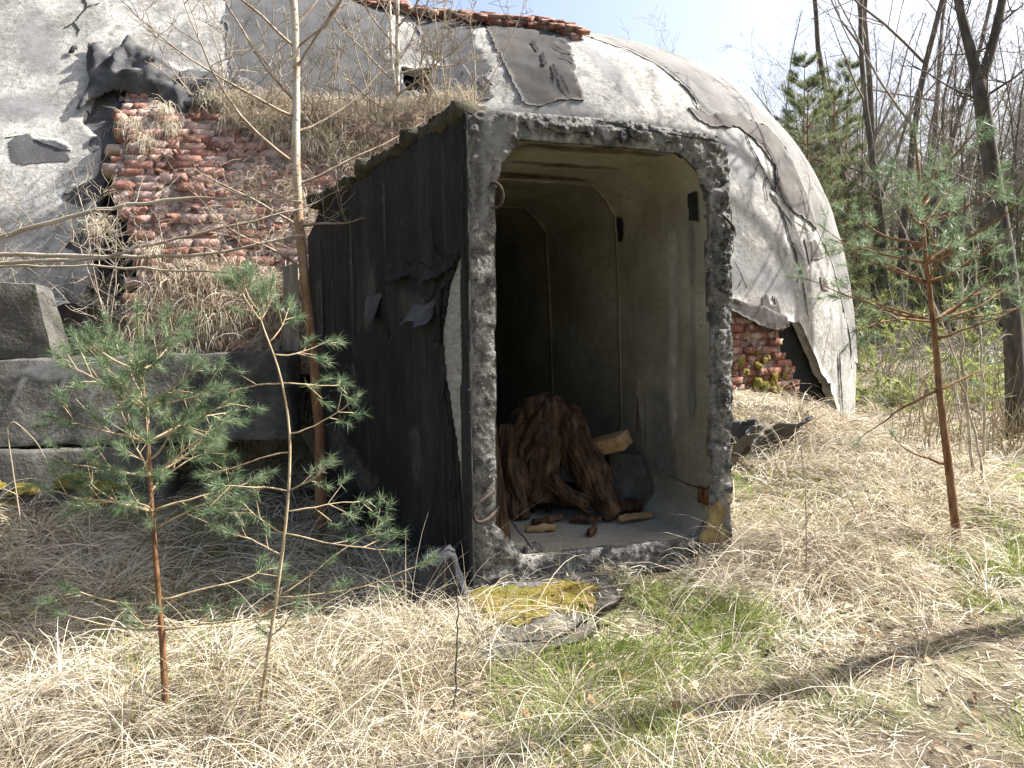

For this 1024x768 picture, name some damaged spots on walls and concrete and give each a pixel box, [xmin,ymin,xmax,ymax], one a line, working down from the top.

spalling [7,129,73,165]
peeling [364,293,382,324]
peeling [400,268,462,502]
crack [594,119,817,319]